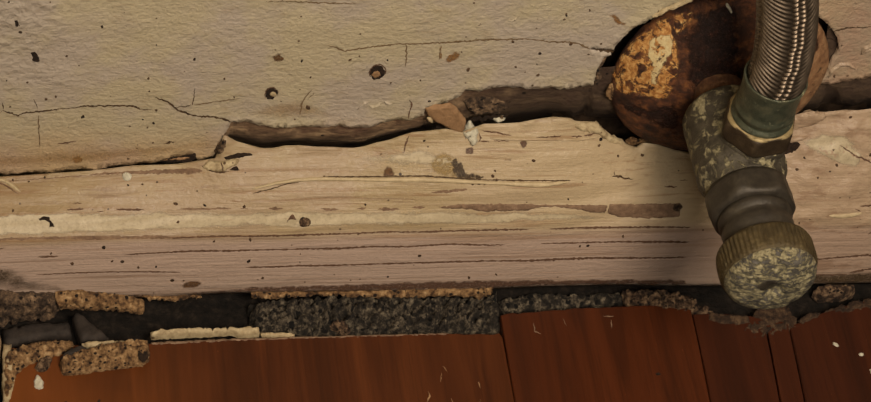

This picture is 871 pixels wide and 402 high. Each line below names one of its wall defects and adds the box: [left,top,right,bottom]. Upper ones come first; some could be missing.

crack [328,38,614,66]
spalling [594,0,693,85]
corrosion [613,6,740,133]
crack [0,90,239,147]
crack [465,130,511,143]
crack [536,131,594,139]
spalling [552,113,653,146]